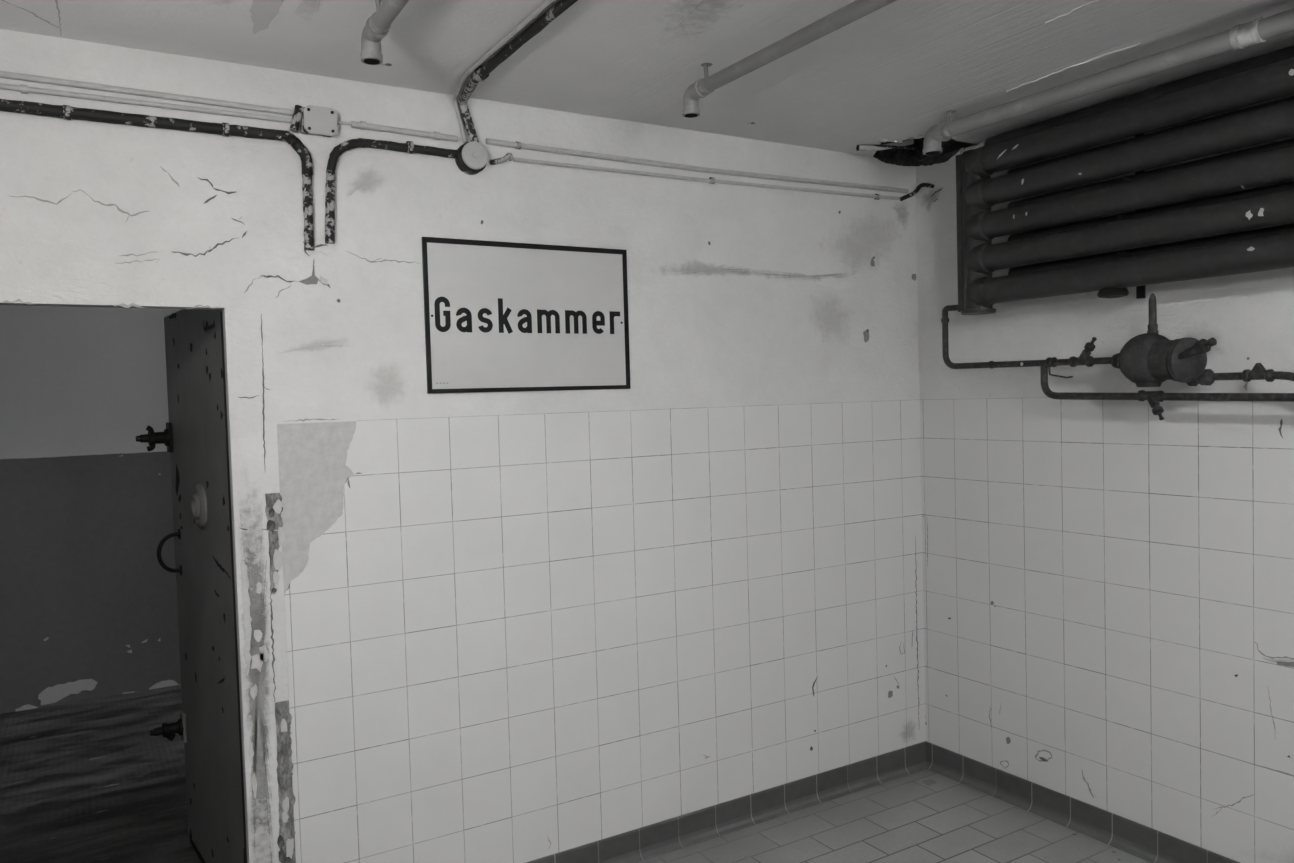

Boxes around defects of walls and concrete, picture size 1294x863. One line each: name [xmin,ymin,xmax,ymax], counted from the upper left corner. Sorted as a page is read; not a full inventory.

crack [8,190,148,221]
crack [118,166,247,264]
crack [239,275,336,465]
peeling [212,421,361,863]
peeling [15,679,98,712]